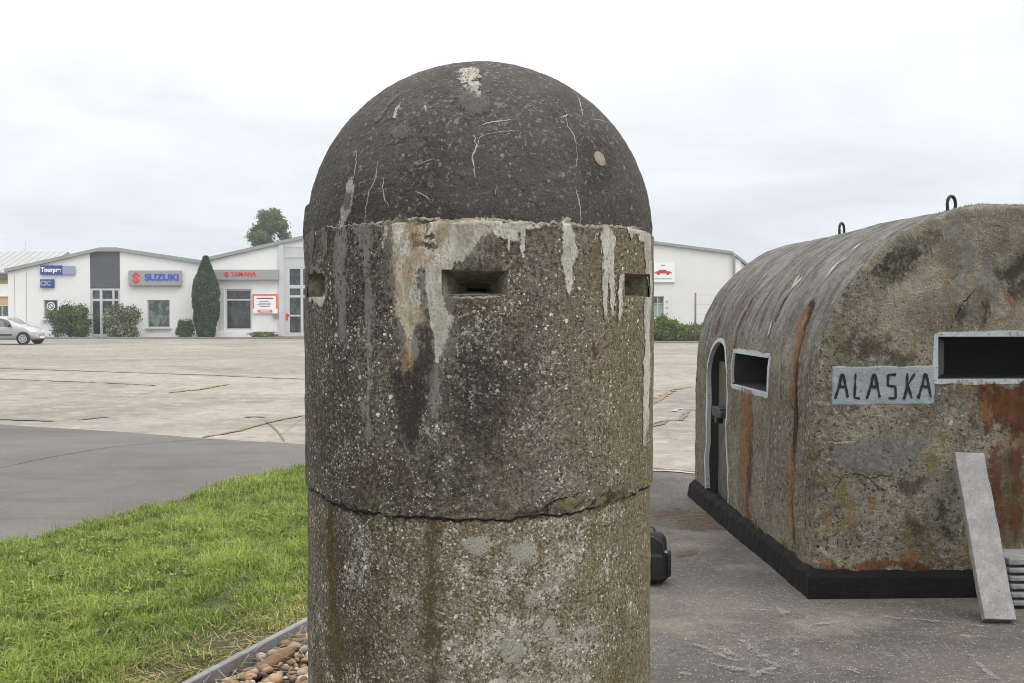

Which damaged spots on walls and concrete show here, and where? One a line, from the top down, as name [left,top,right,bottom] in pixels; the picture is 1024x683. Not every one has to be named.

peeling [445,67,489,119]
leakage [309,177,542,450]
leakage [561,218,579,295]
leakage [600,226,624,321]
leakage [627,226,652,447]
crack [309,469,695,522]
spalling [515,484,630,519]
corrosion [739,388,753,518]
corrosion [788,299,815,540]
crack [835,473,893,498]
corrosion [957,380,1024,543]